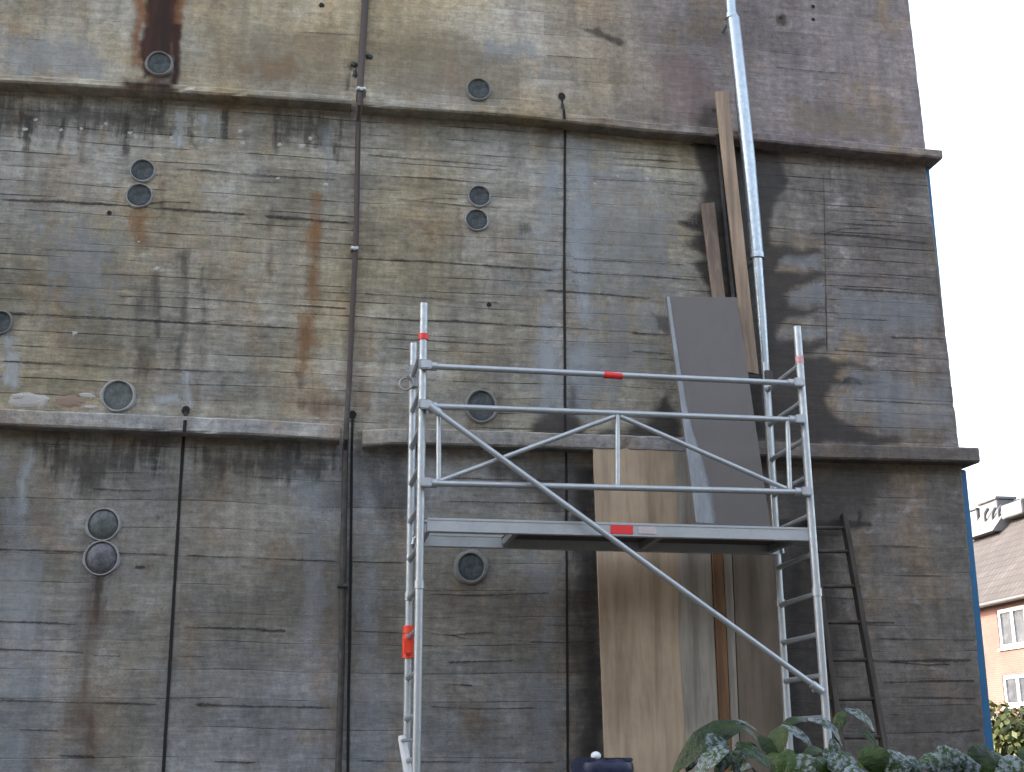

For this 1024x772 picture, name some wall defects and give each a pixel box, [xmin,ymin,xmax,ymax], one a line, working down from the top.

corrosion [124,0,184,92]
damp [683,143,736,297]
damp [734,147,898,445]